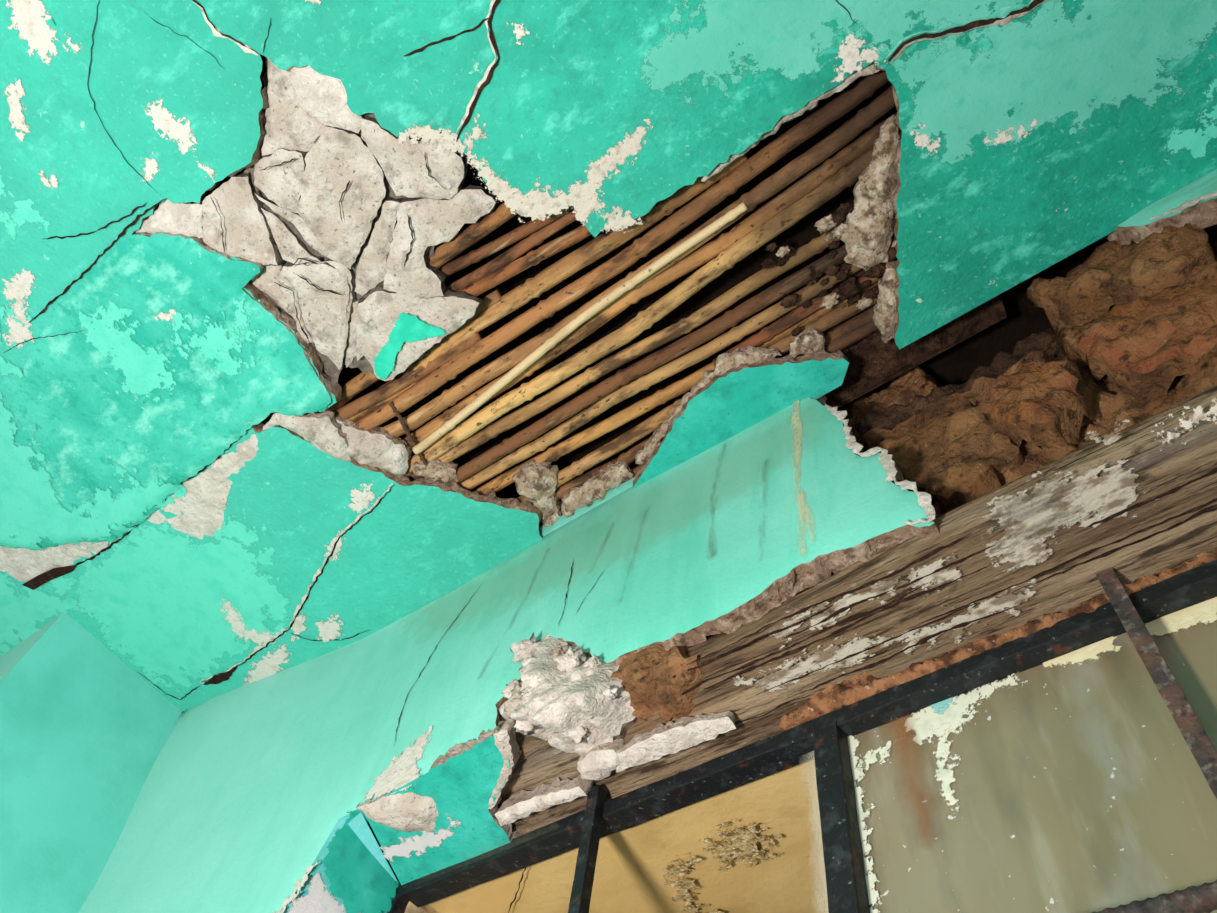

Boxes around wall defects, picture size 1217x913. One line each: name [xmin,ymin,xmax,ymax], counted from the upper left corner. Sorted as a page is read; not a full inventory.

crack [144,0,271,67]
crack [404,0,501,142]
crack [886,0,1049,63]
crack [4,2,167,353]
spalling [512,0,1217,527]
peeling [0,268,458,695]
crack [137,483,394,700]
peeling [272,725,461,913]
spalling [488,632,736,826]
rust [778,593,1110,730]
spalling [1092,880,1217,913]
rust [1122,548,1217,596]